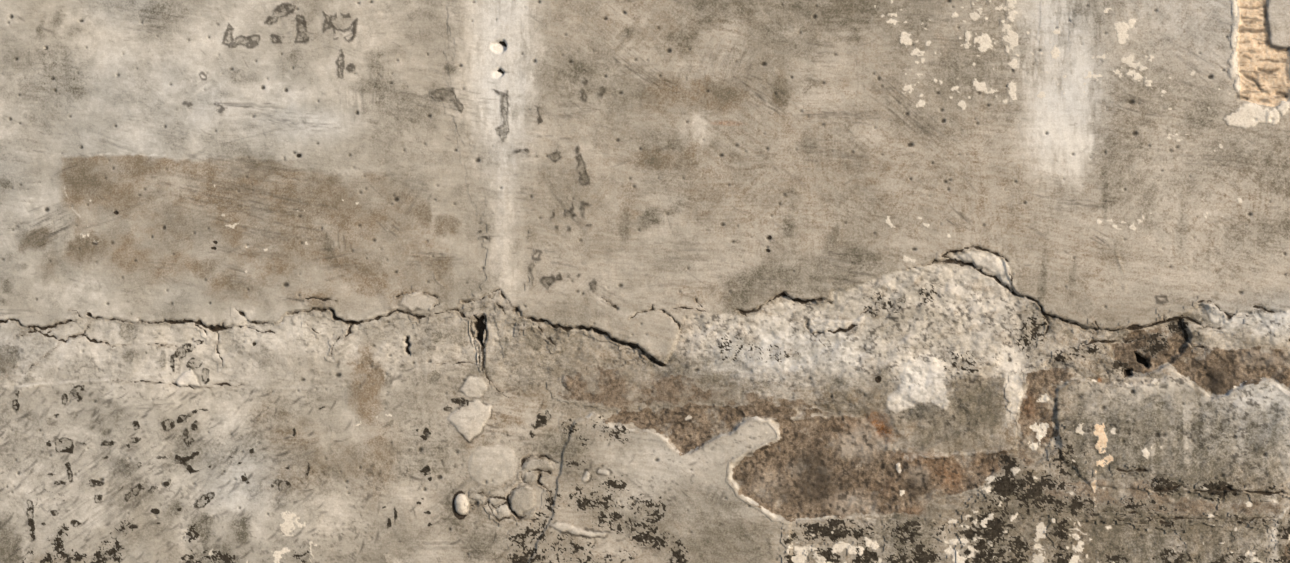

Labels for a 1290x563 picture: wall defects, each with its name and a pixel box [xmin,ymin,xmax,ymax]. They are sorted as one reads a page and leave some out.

peeling [873,0,1174,112]
spalling [1193,0,1290,130]
water stain [13,0,562,372]
water stain [986,0,1129,270]
crack [0,284,889,412]
crack [905,240,1290,354]
water stain [332,333,410,495]
spalling [505,332,1290,550]
peeling [832,542,853,553]
peeling [942,518,965,563]
peeling [1033,518,1052,563]
peeling [1071,521,1113,563]